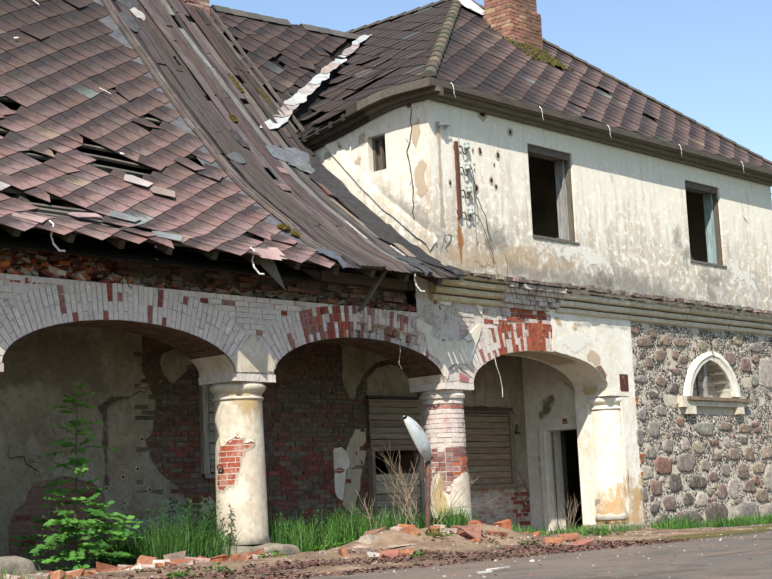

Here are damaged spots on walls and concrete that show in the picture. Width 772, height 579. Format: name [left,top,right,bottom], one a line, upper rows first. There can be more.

crack [406,108,415,220]
peeling [414,159,428,197]
spalling [0,252,134,321]
spalling [144,278,249,324]
flaking render [289,292,417,343]
spalling [474,308,561,363]
spalling [6,475,115,558]
spalling [216,432,256,493]
flaking render [424,447,469,495]
spalling [470,468,531,532]